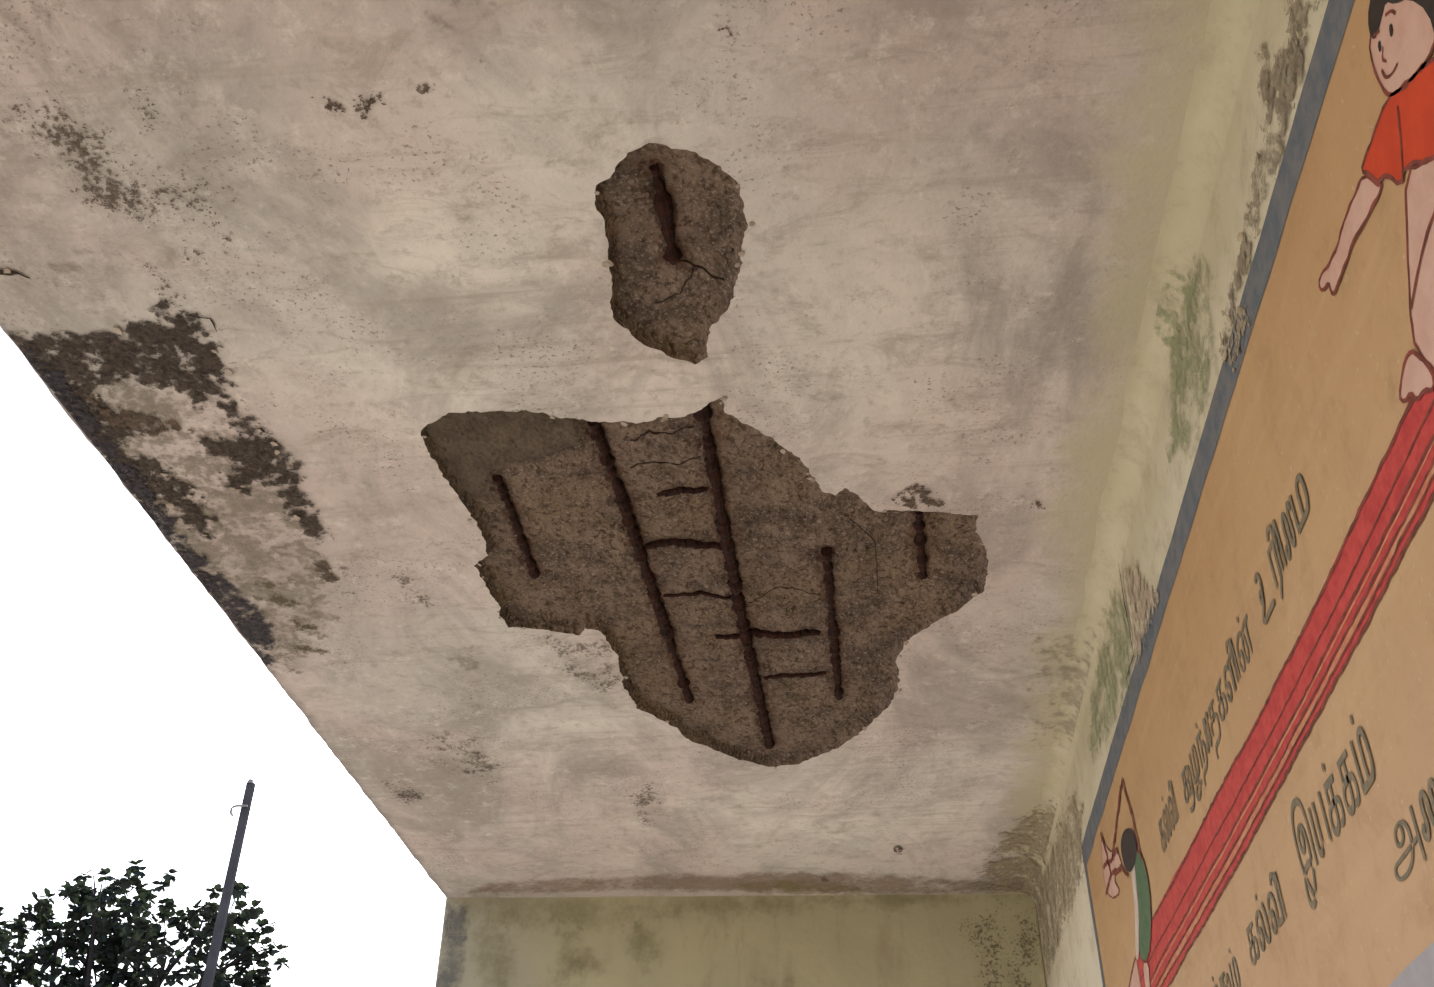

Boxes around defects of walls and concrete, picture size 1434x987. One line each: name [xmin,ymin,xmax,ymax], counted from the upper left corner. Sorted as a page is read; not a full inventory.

crack [0,268,30,278]
water stain [2,90,236,266]
spalling [594,143,755,364]
water stain [7,240,354,674]
spalling [421,397,989,769]
water stain [436,908,466,987]
water stain [477,874,1040,987]